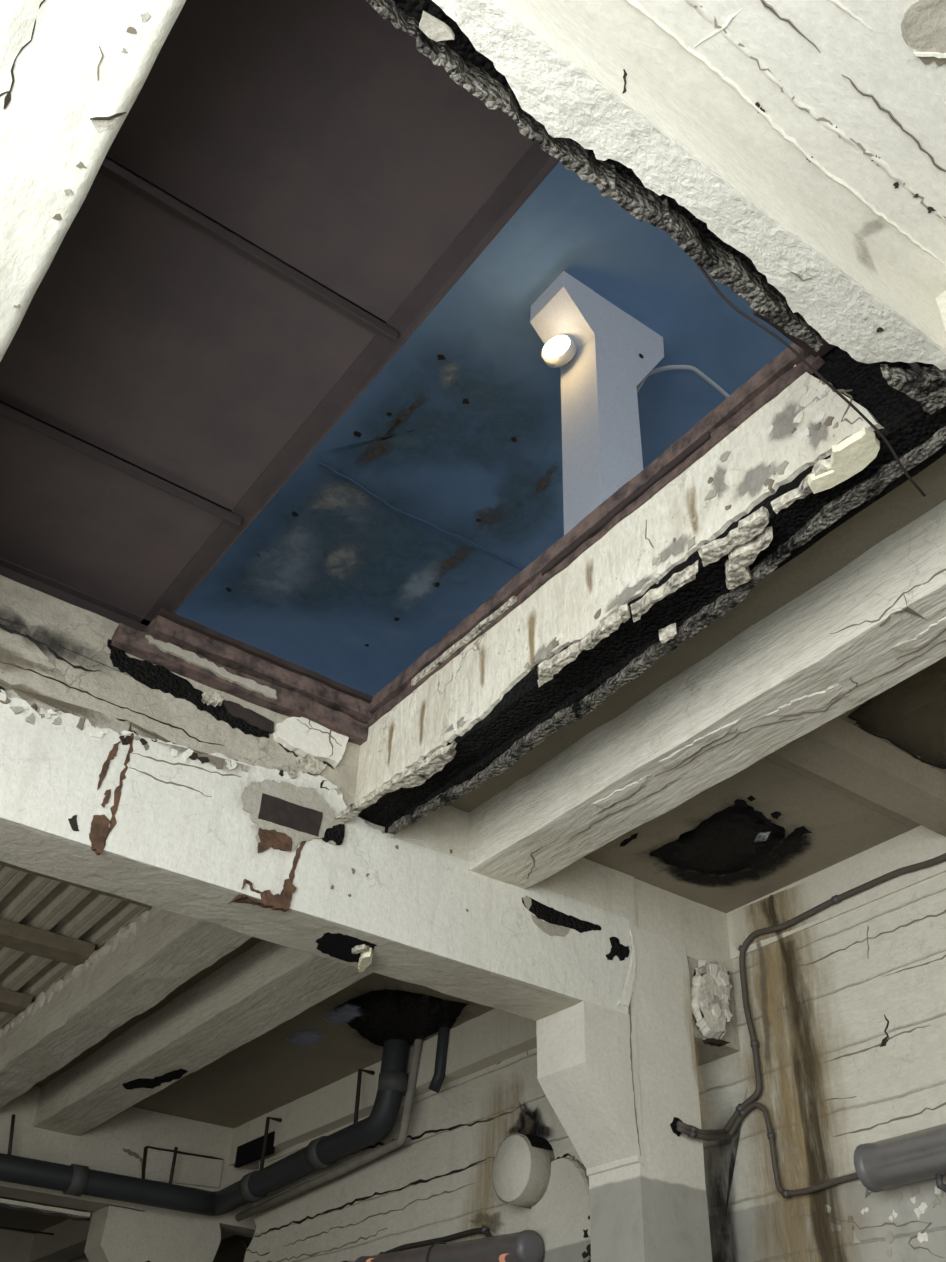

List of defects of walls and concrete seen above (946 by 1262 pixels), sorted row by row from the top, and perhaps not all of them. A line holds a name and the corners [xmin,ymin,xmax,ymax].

crack [0,0,45,109]
peeling [419,10,455,42]
crack [620,69,628,94]
crack [693,0,946,220]
spalling [388,260,946,849]
water stain [0,680,81,714]
water stain [0,613,82,658]
spalling [107,639,274,738]
corrosion [68,723,134,855]
spalling [170,748,345,912]
water stain [749,890,843,1262]
water stain [709,1130,740,1262]